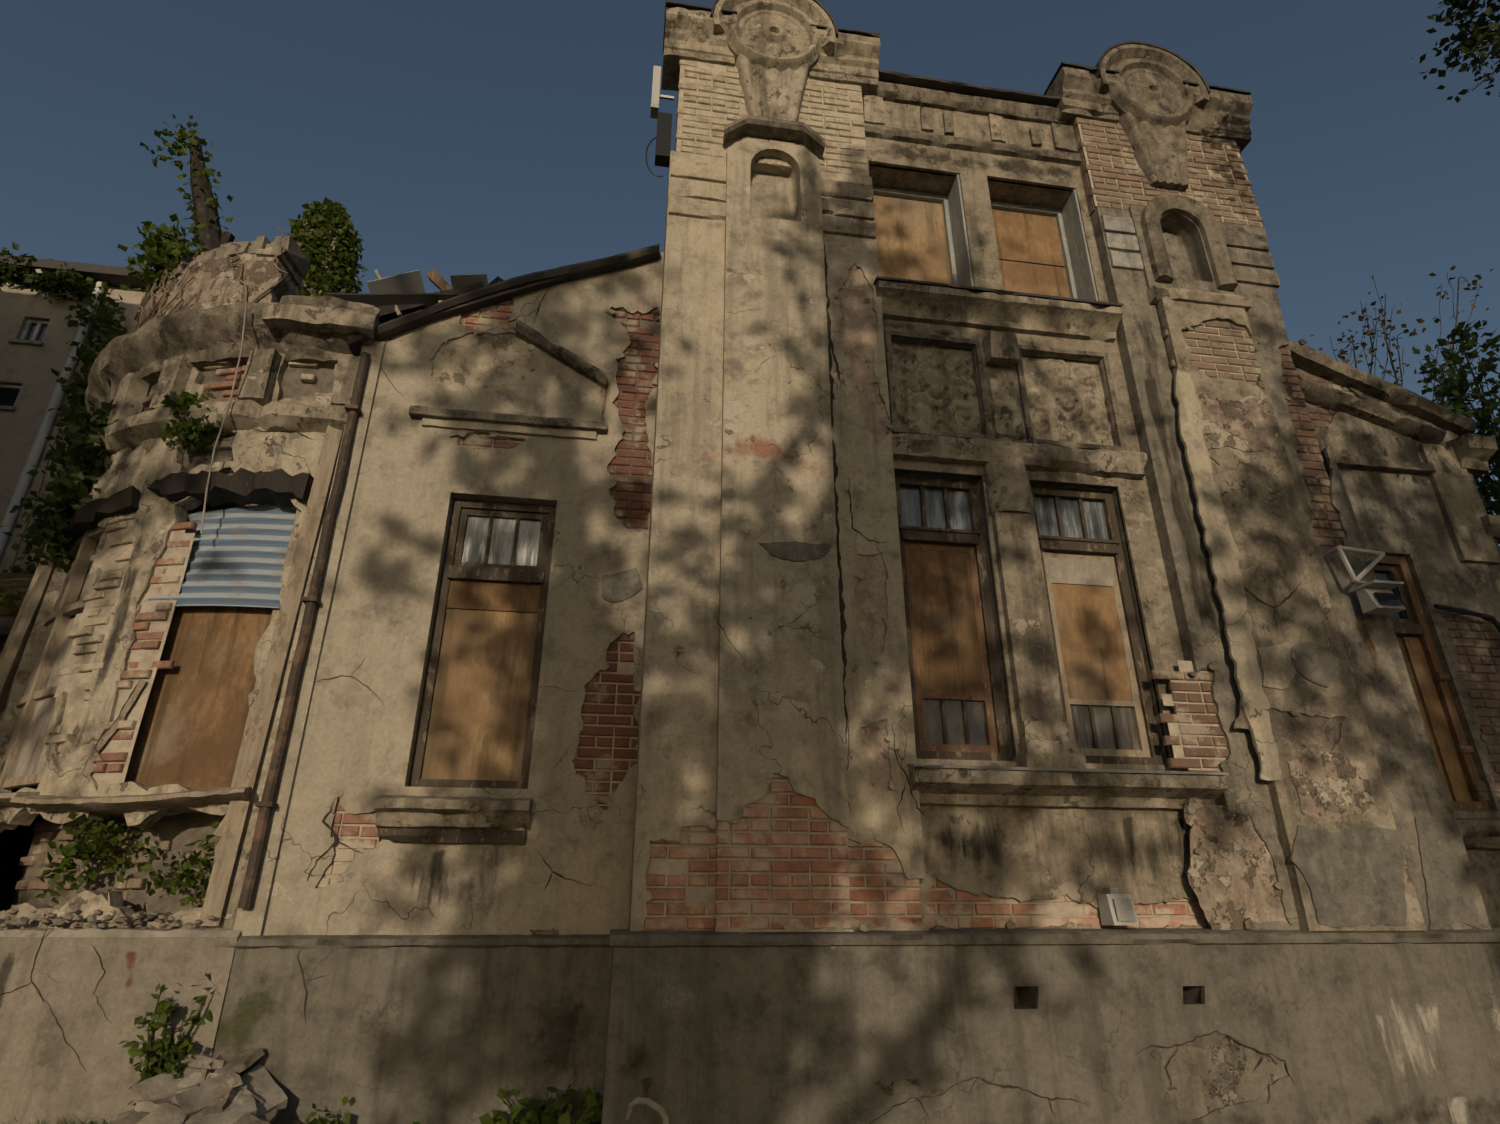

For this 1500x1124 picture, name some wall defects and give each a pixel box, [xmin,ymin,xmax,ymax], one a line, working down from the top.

peeling [431,300,536,391]
spalling [606,308,660,533]
spalling [1162,320,1356,552]
crack [775,233,888,809]
crack [307,797,363,881]
spalling [572,633,641,811]
crack [892,725,924,834]
spalling [640,774,1288,935]
spalling [1150,660,1249,775]
crack [2,926,87,1072]
crack [92,946,112,1023]
crack [860,1068,1091,1124]